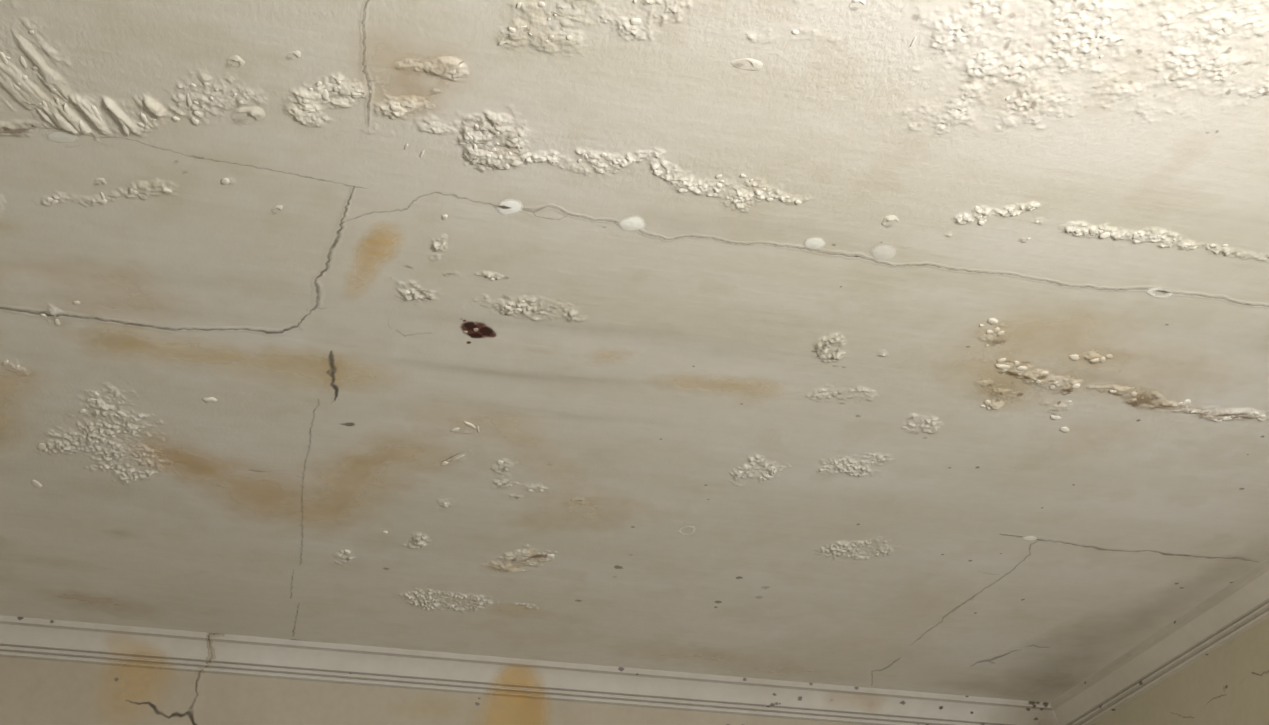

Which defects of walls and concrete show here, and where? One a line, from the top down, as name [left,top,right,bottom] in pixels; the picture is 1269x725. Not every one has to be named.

crack [358,0,376,128]
crack [0,186,371,337]
crack [518,202,1269,309]
crack [319,349,347,401]
corrosion [461,320,496,344]
crack [998,532,1260,564]
crack [129,633,225,725]
water stain [475,667,543,725]